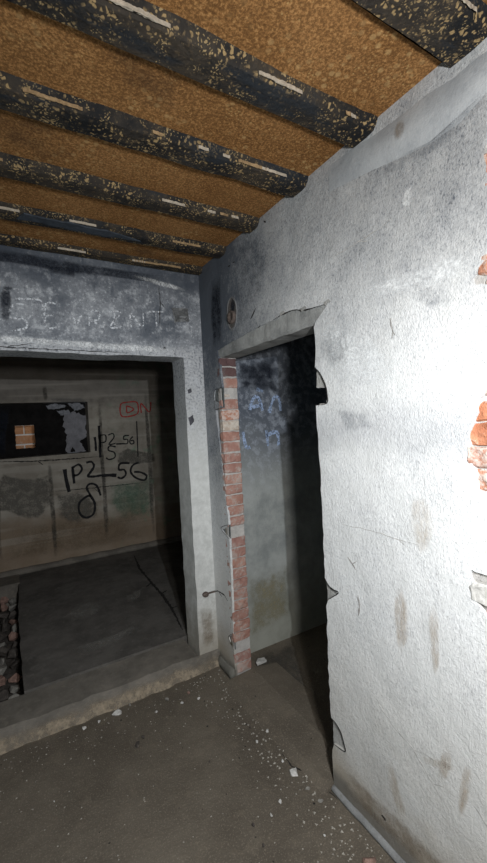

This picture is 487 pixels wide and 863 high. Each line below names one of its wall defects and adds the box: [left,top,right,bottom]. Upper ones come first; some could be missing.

spalling [474,254,487,285]
peeling [46,403,87,453]
spalling [467,389,487,491]
crack [134,556,183,630]
spalling [469,571,487,613]